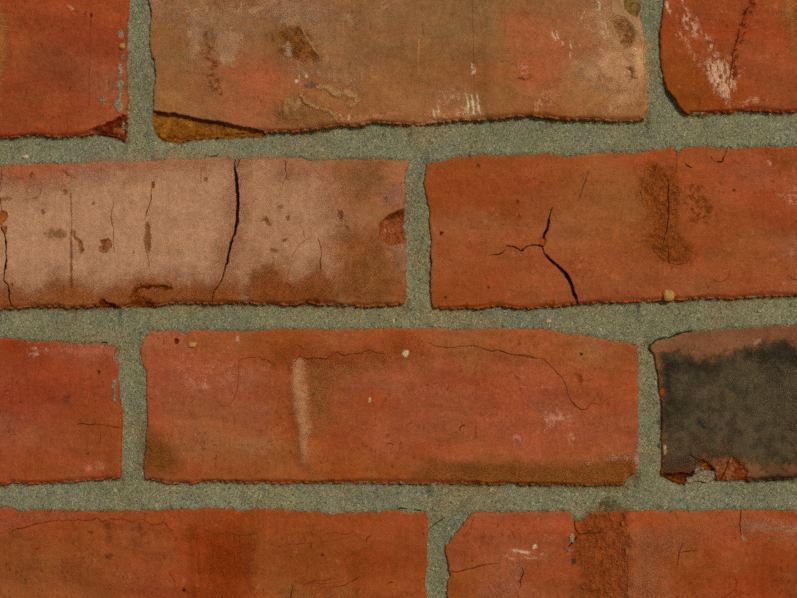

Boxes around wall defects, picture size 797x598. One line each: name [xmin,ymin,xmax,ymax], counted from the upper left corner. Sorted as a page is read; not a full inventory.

crack [729,0,756,79]
spalling [152,111,265,144]
crack [0,168,13,307]
crack [200,152,240,303]
crack [489,207,578,305]